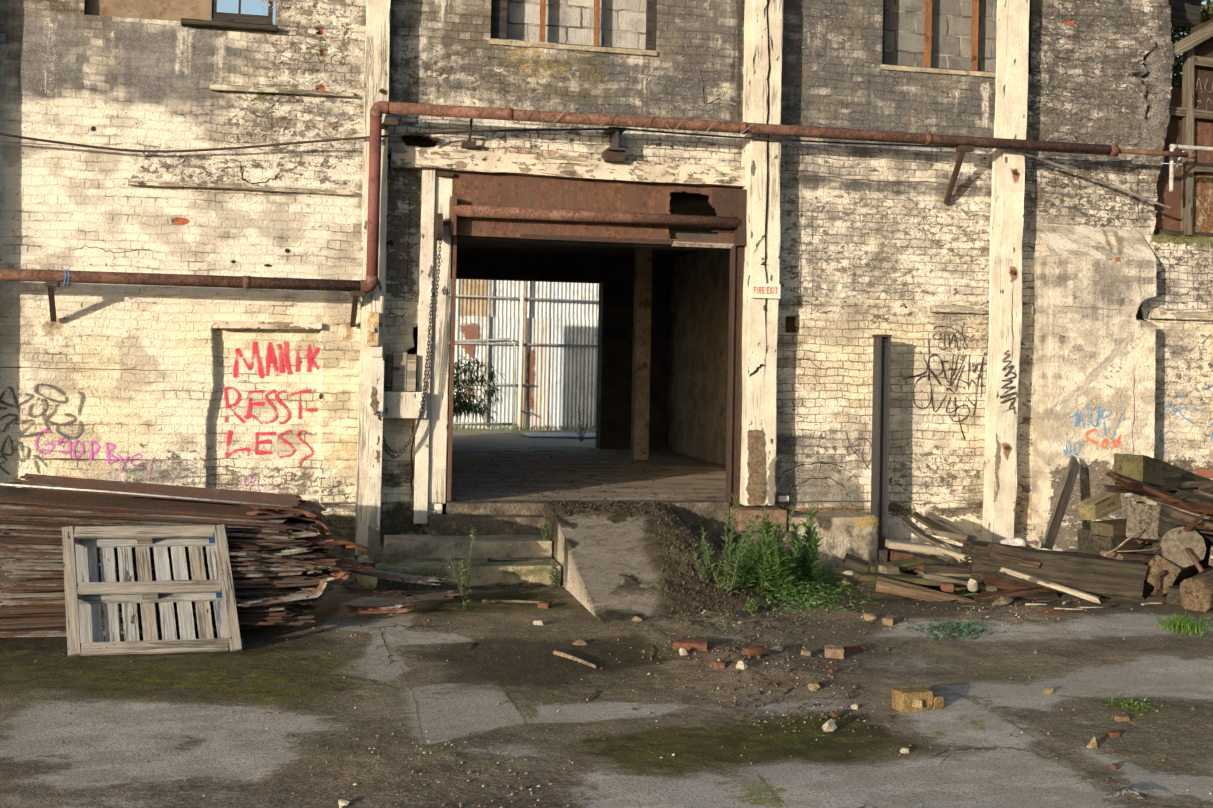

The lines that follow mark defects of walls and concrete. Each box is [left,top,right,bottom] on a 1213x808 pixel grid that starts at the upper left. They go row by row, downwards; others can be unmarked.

damp [23,21,73,90]
damp [111,30,226,99]
rust [1154,19,1213,235]